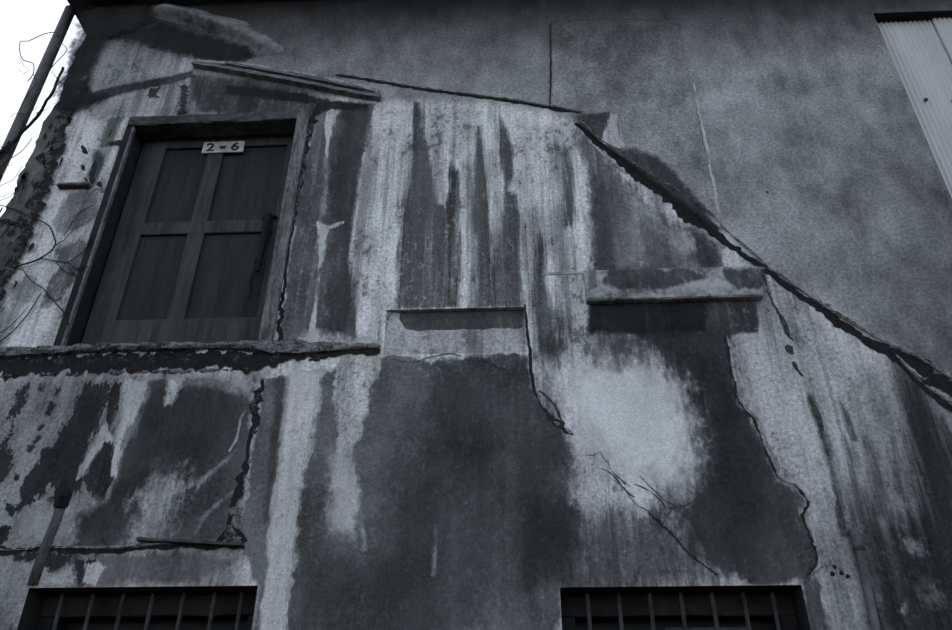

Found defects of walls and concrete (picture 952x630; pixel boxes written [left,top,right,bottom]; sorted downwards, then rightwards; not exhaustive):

crack [0,76,90,301]
crack [276,104,321,341]
damp [396,102,523,331]
damp [532,234,564,368]
crack [335,18,952,435]
crack [0,379,265,556]
damp [0,333,830,630]
crack [589,452,718,576]
damp [808,368,952,630]